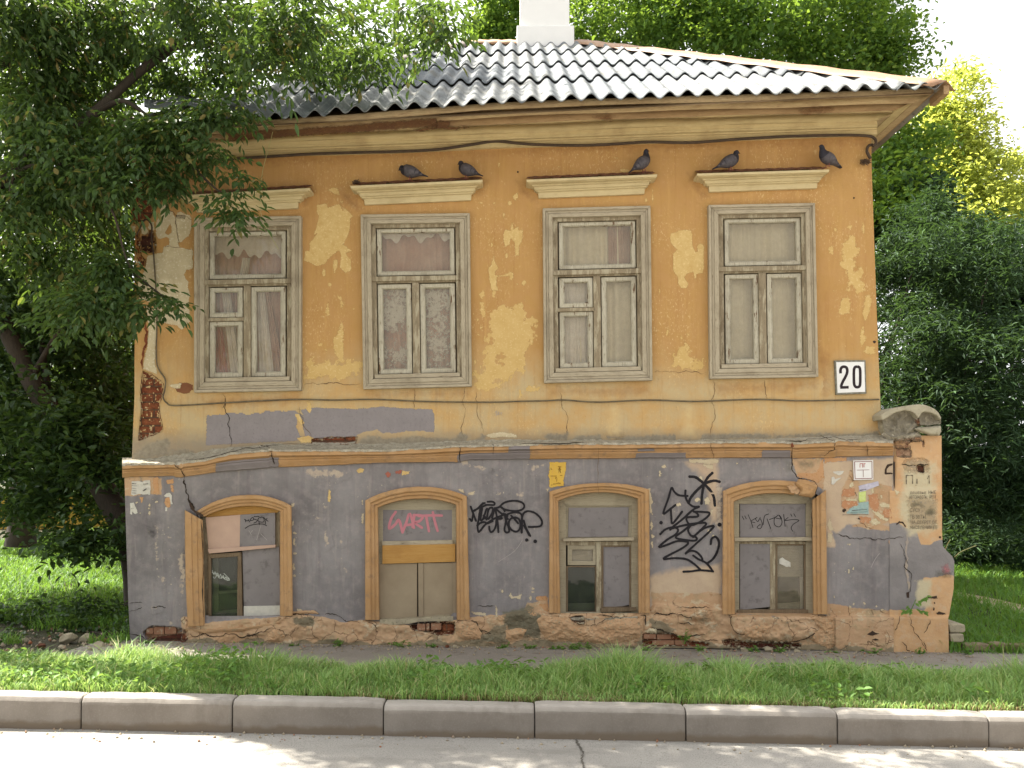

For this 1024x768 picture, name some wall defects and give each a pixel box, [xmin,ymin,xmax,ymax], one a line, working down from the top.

flaking render [131,179,193,441]
peeling [304,187,355,316]
peeling [303,323,363,384]
peeling [472,193,540,398]
peeling [670,230,704,288]
peeling [828,224,876,355]
peeling [136,477,174,516]
crack [175,399,377,638]
peeling [841,482,906,527]
flaking render [409,621,455,636]
flaking render [642,633,709,647]
crack [839,534,931,652]